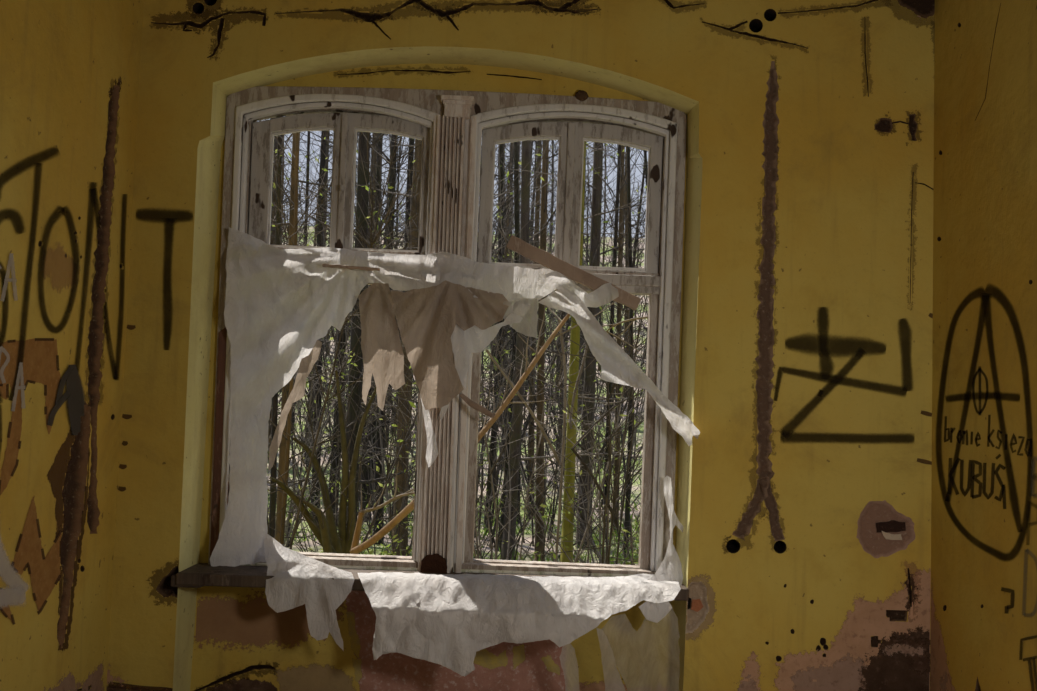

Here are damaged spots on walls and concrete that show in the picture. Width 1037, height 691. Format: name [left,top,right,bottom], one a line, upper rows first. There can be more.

crack [150,0,600,60]
crack [337,69,542,80]
crack [663,0,879,97]
spalling [856,500,915,558]
peeling [194,589,332,652]
peeling [276,590,565,691]
spalling [685,574,717,640]
peeling [737,569,956,691]
peeling [44,660,104,691]